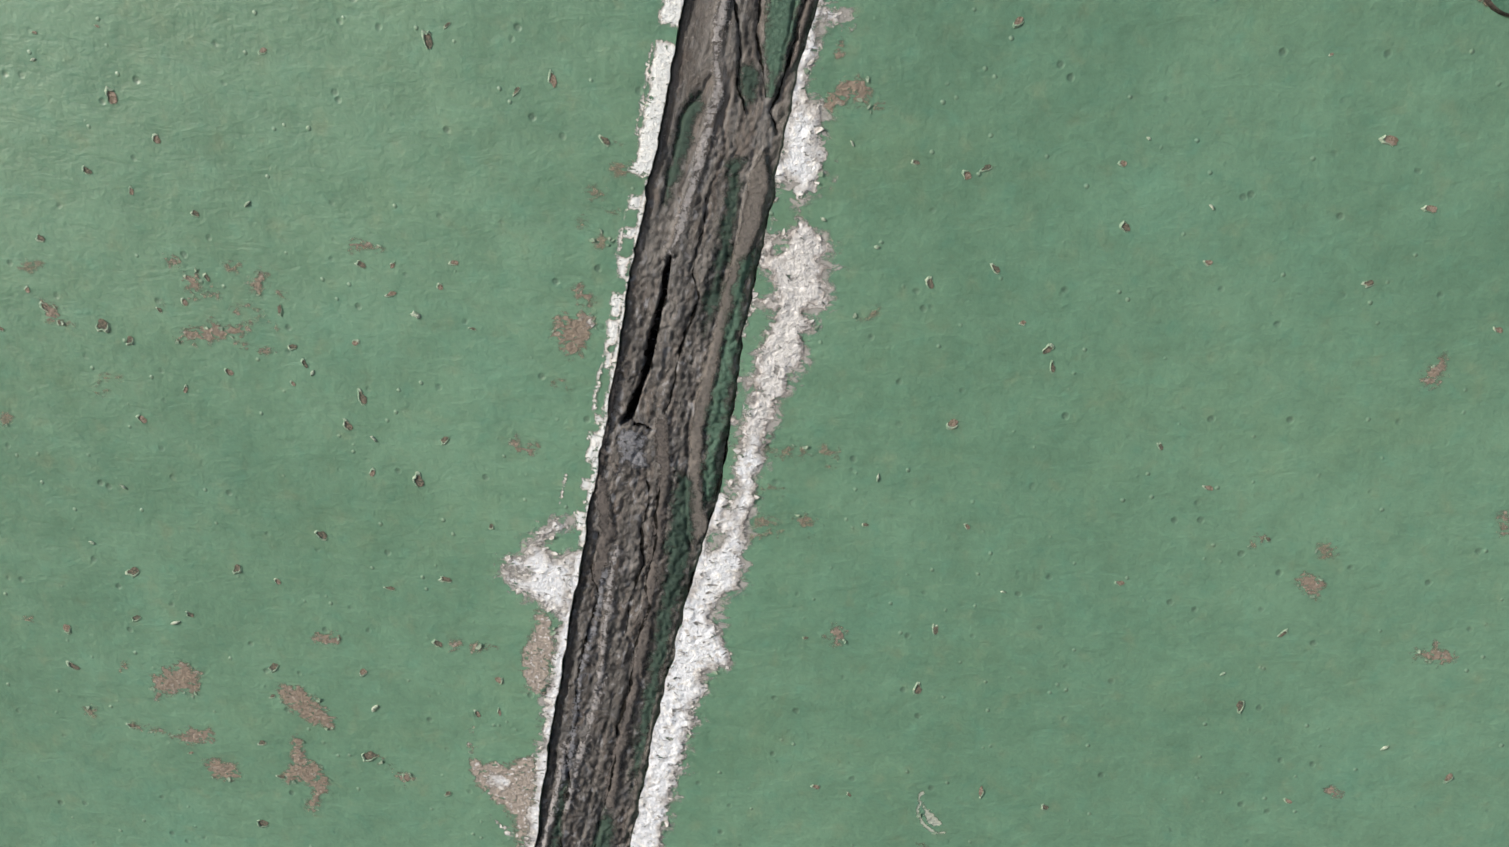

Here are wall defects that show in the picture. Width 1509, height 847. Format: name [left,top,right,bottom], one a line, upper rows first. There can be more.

crack [733,0,806,130]
peeling [165,255,308,368]
crack [623,197,707,429]
peeling [467,0,684,847]
crack [708,367,740,526]
peeling [630,0,885,847]
peeling [149,661,203,701]
peeling [126,723,241,782]
peeling [268,663,336,812]
crack [559,473,694,847]